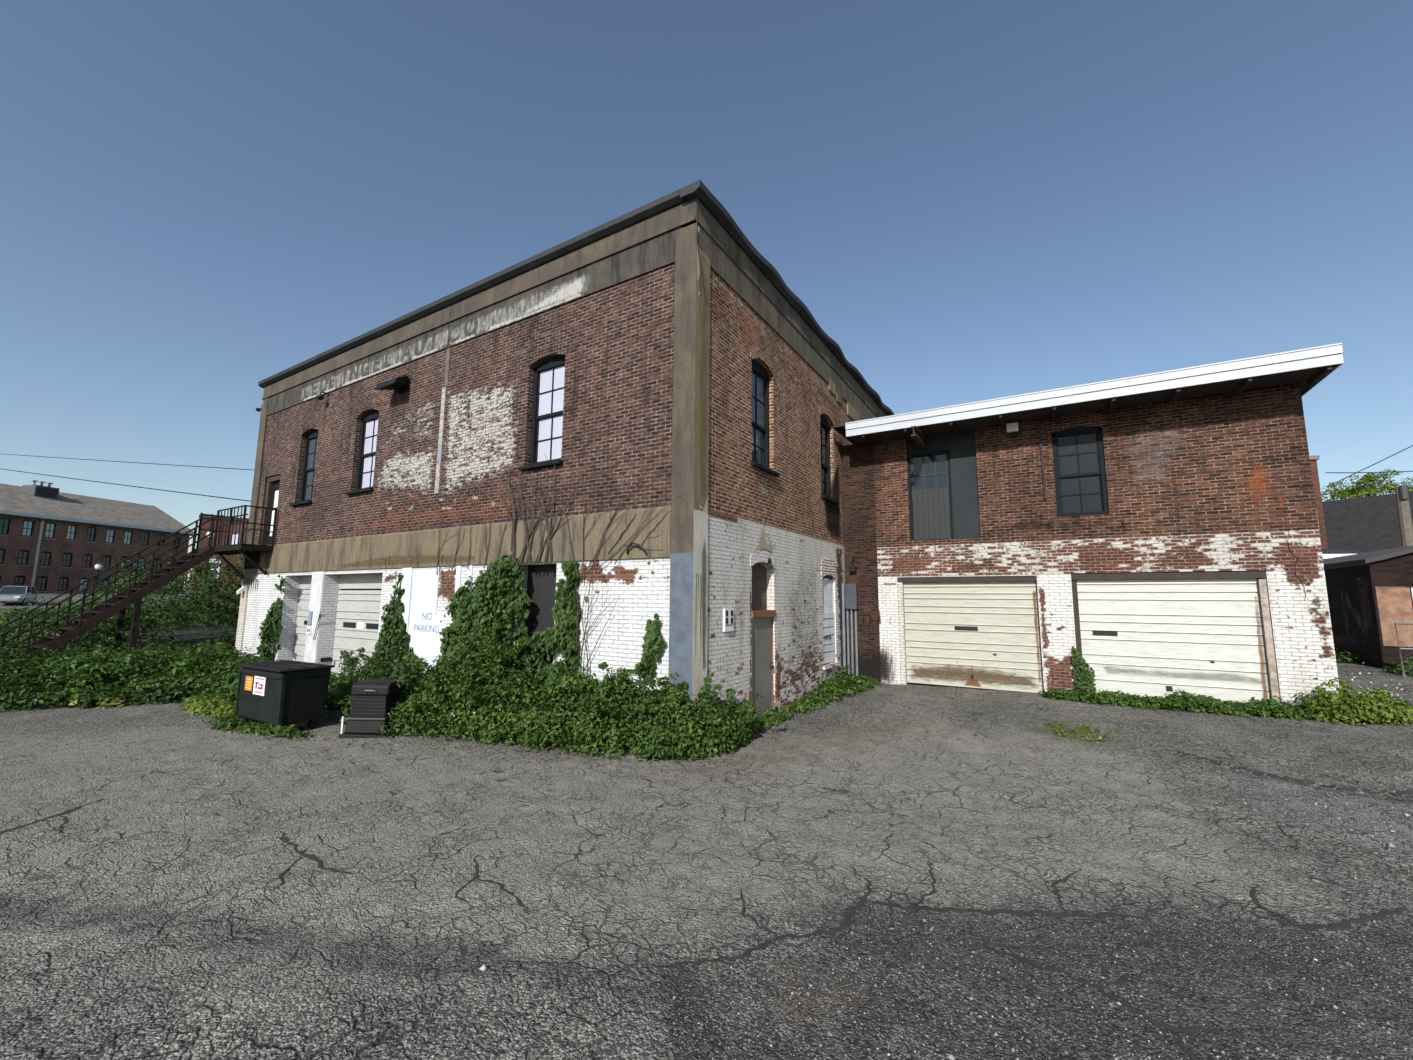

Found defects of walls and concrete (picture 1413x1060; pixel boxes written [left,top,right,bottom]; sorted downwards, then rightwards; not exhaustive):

peeling [358,382,518,534]
peeling [573,560,669,602]
peeling [738,586,752,703]
peeling [755,519,775,551]
peeling [775,599,823,704]
peeling [889,549,1009,575]
peeling [1039,587,1077,692]
peeling [1056,540,1216,583]
peeling [1275,543,1357,680]